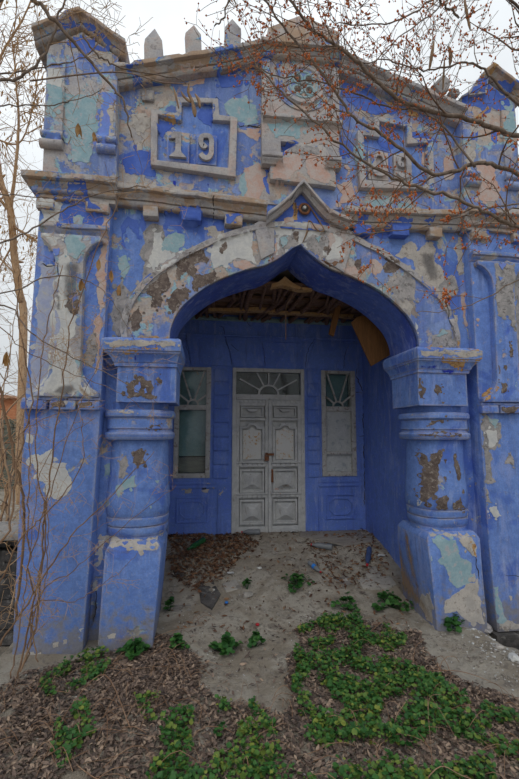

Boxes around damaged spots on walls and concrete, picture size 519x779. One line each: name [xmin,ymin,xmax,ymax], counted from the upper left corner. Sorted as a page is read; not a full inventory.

peeling [44,68,120,163]
peeling [122,93,181,197]
peeling [443,132,508,205]
peeling [459,63,518,144]
flaking render [197,66,482,372]
peeling [25,177,256,411]
peeling [26,449,72,500]
flaking render [414,448,471,517]
peeling [481,405,519,520]
peeling [94,530,164,567]
peeling [429,528,485,627]
peeling [493,587,519,632]